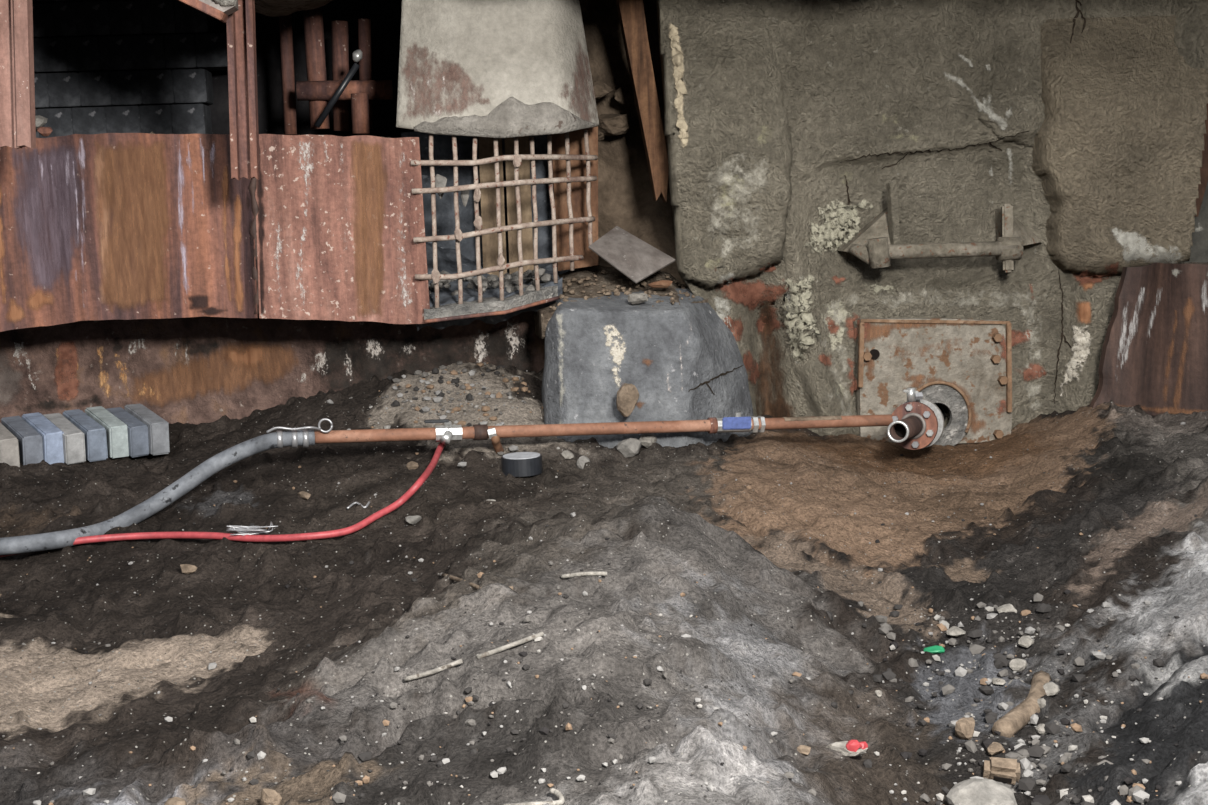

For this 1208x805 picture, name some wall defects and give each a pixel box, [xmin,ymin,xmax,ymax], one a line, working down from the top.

corrosion [0,189,52,321]
corrosion [95,149,110,296]
corrosion [222,167,243,311]
corrosion [352,142,387,314]
damp [714,273,736,340]
corrosion [720,265,791,418]
corrosion [827,315,932,393]
crack [838,131,1028,239]
corrosion [1074,262,1118,323]
corrosion [1142,299,1203,414]